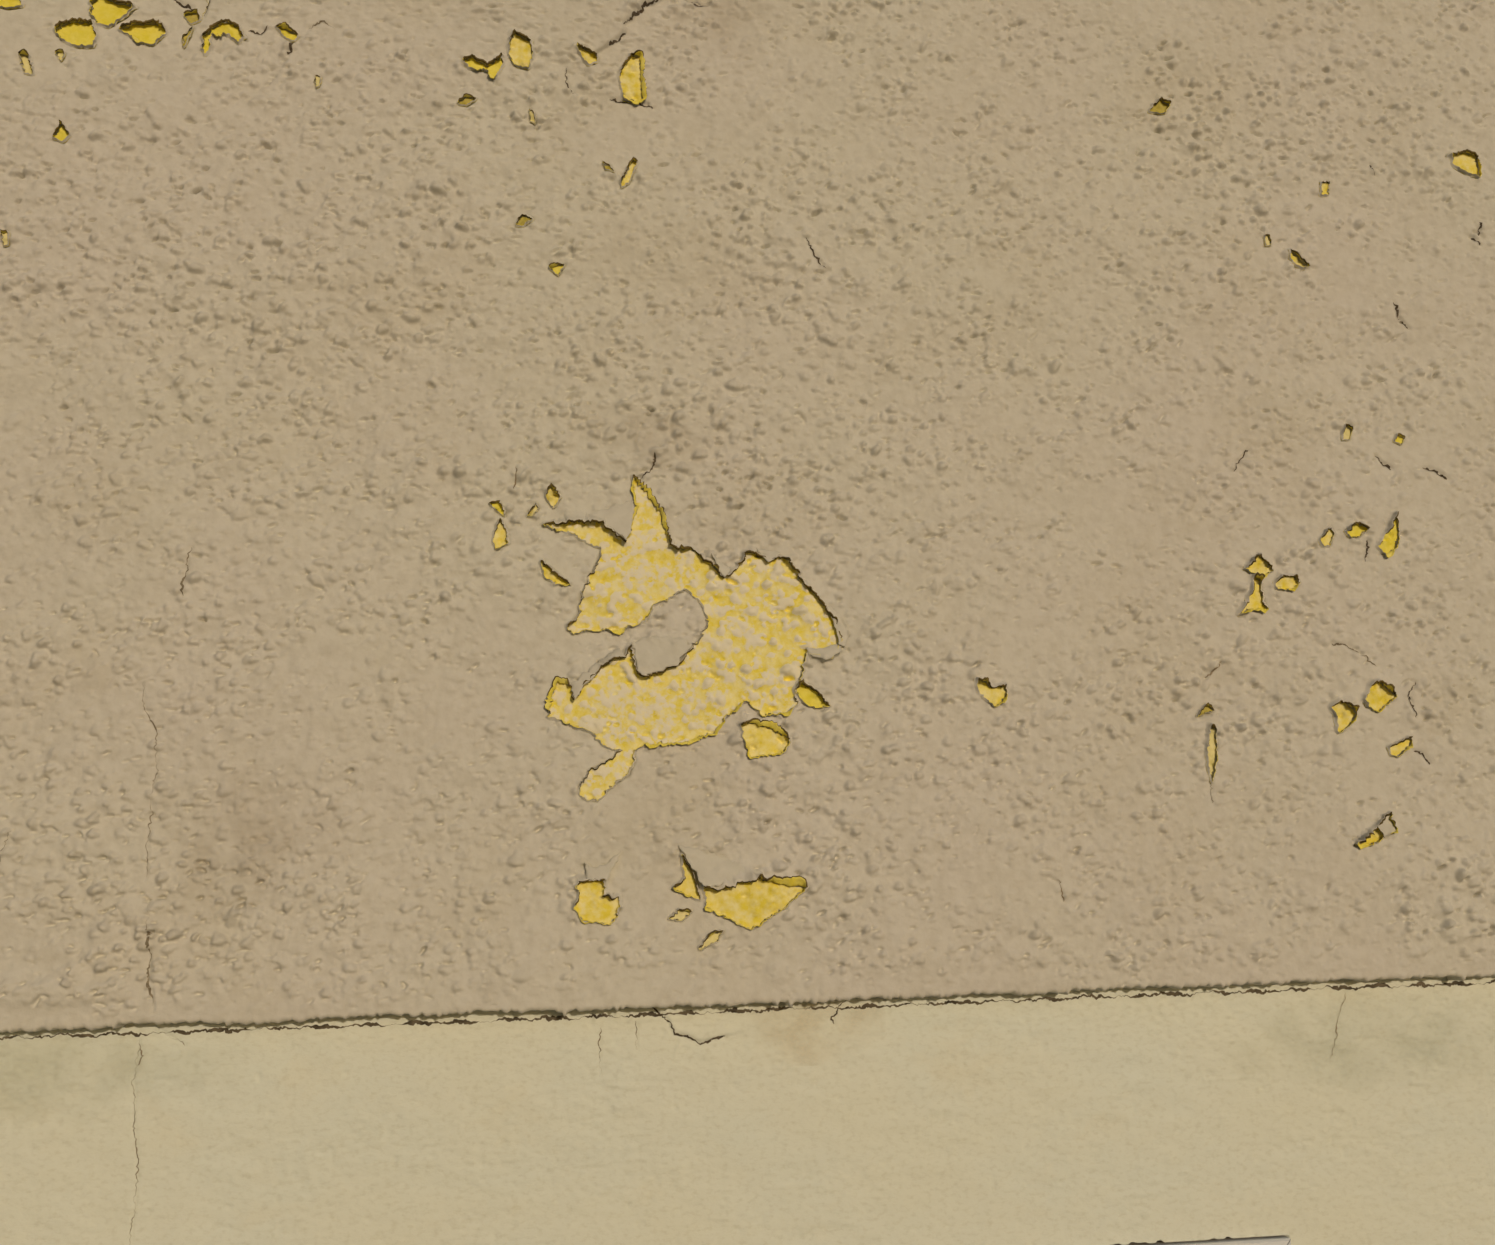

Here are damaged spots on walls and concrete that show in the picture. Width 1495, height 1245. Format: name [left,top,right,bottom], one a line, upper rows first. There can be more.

peeling [52,0,247,62]
peeling [460,29,537,79]
peeling [616,50,647,105]
crack [609,0,712,46]
peeling [1446,149,1482,179]
peeling [1317,509,1401,558]
peeling [1235,552,1301,617]
peeling [526,474,850,803]
peeling [973,675,1009,708]
peeling [1327,678,1397,735]
peeling [570,851,623,926]
peeling [667,845,810,951]